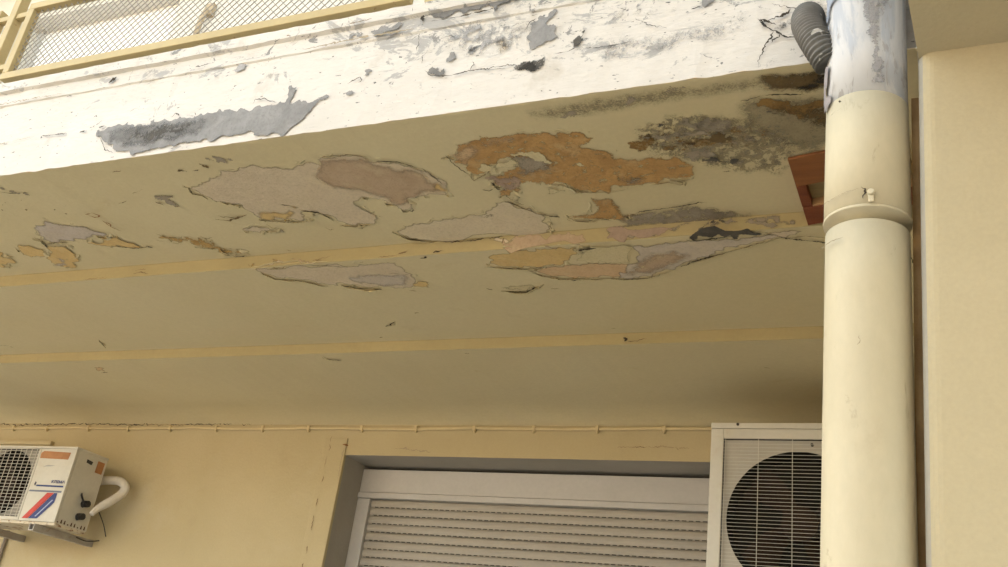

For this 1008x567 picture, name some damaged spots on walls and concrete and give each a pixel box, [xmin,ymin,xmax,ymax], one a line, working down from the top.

spalling [420,0,557,77]
peeling [560,19,739,56]
crack [757,4,794,65]
spalling [81,85,329,156]
damp [547,72,826,173]
peeling [184,153,453,235]
peeling [393,111,795,281]
peeling [0,209,428,292]